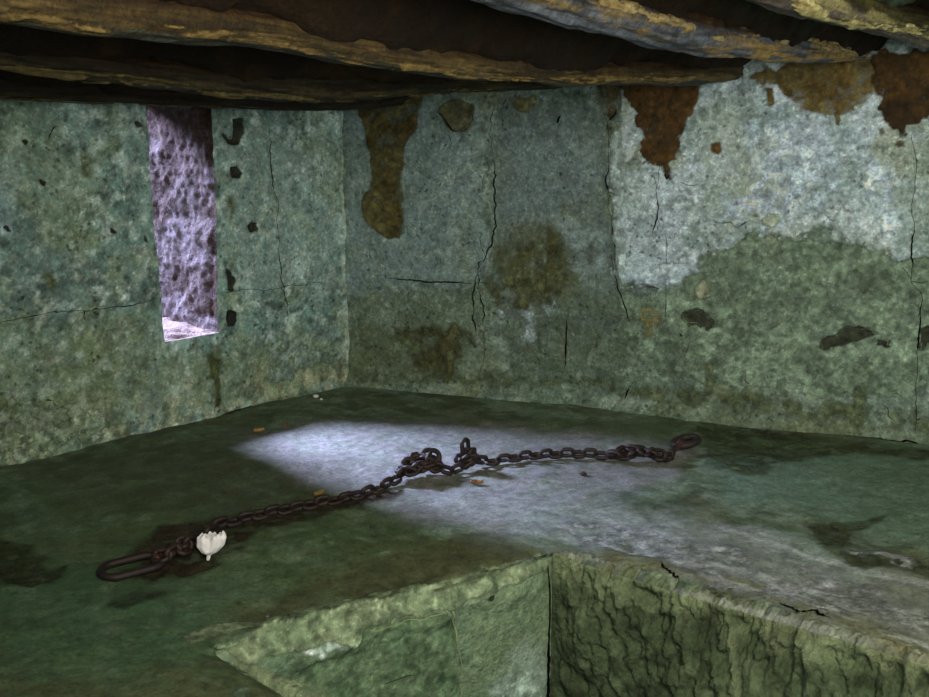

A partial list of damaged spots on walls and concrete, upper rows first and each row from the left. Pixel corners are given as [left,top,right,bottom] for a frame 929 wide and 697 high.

corrosion [359,96,423,238]
corrosion [621,85,700,180]
corrosion [871,48,929,147]
crack [0,299,153,323]
crack [390,104,501,372]
leakage [485,232,573,309]
peeling [609,131,929,401]
crack [871,135,927,444]
leakage [0,541,67,587]